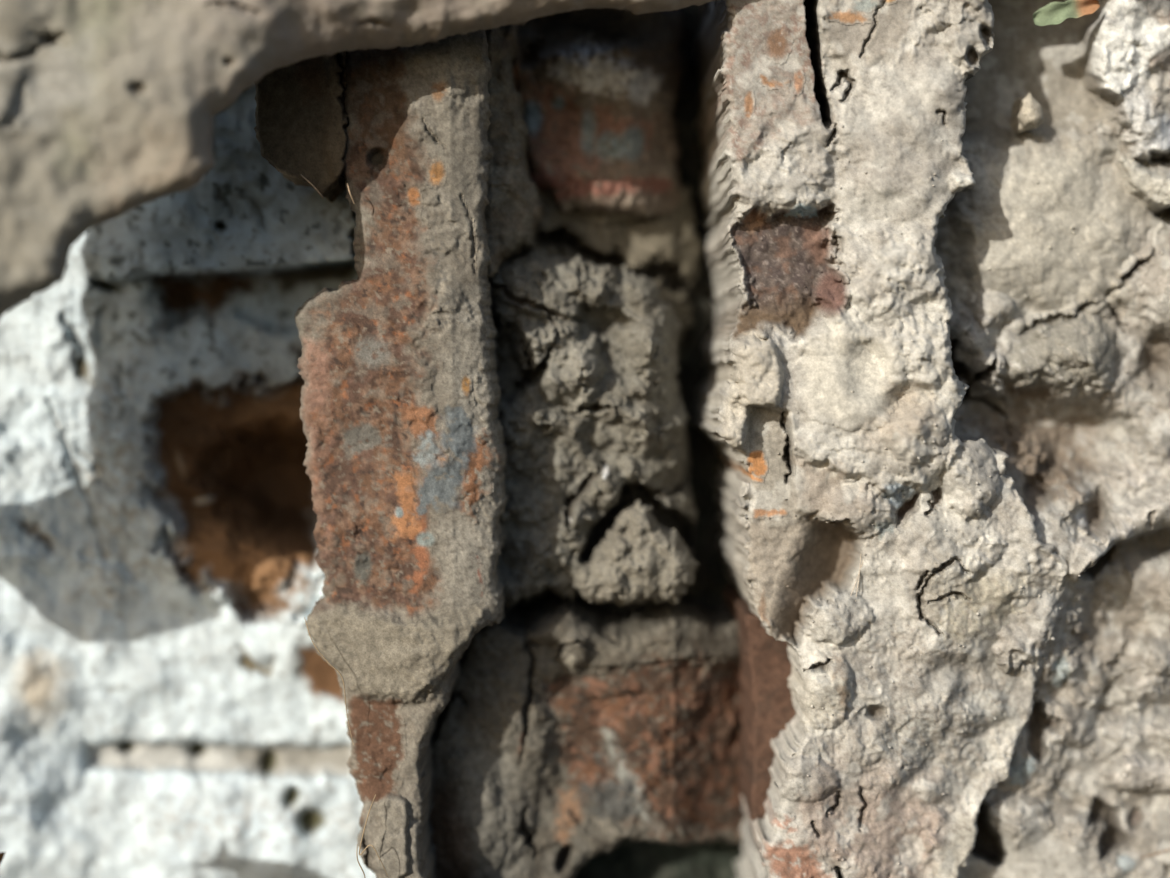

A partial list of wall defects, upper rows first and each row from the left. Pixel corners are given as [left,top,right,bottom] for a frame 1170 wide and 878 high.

crack [803,0,885,147]
crack [534,213,693,308]
rust [297,46,451,618]
crack [950,338,1012,433]
spalling [138,336,325,627]
spalling [578,482,696,565]
spalling [744,511,865,648]
crack [914,556,972,637]
spalling [294,643,346,708]
rust [343,692,406,828]
rust [533,641,746,847]
rust [760,810,838,878]